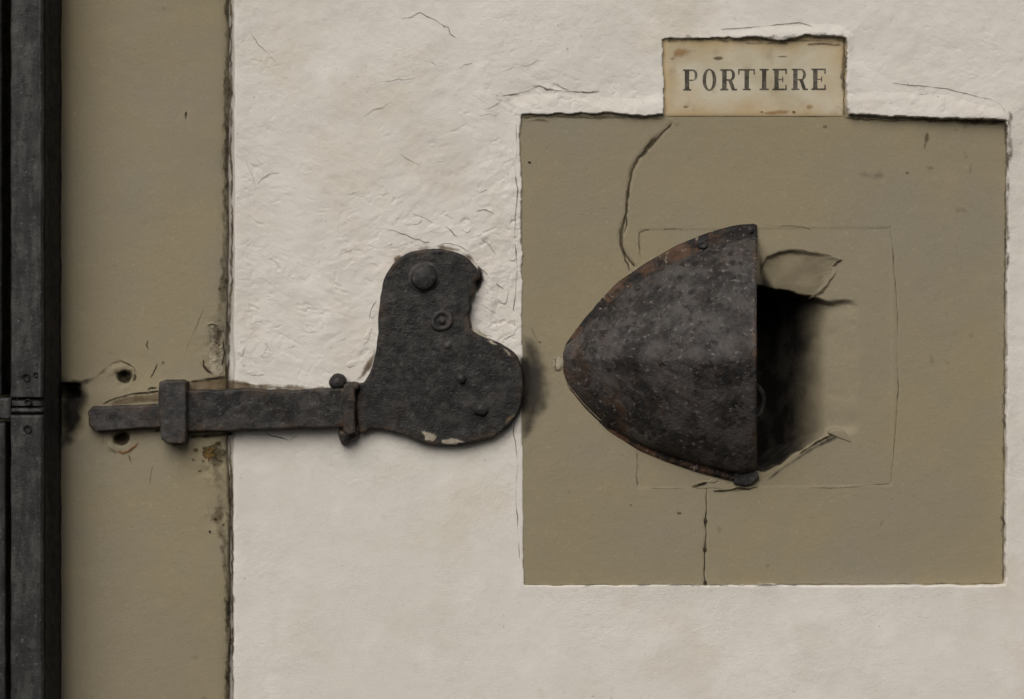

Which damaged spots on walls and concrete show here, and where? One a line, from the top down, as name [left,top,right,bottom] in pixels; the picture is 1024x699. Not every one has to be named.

crack [490,85,675,269]
crack [668,22,1012,312]
flaking render [758,249,842,299]
crack [636,490,843,585]
crack [935,339,1006,584]